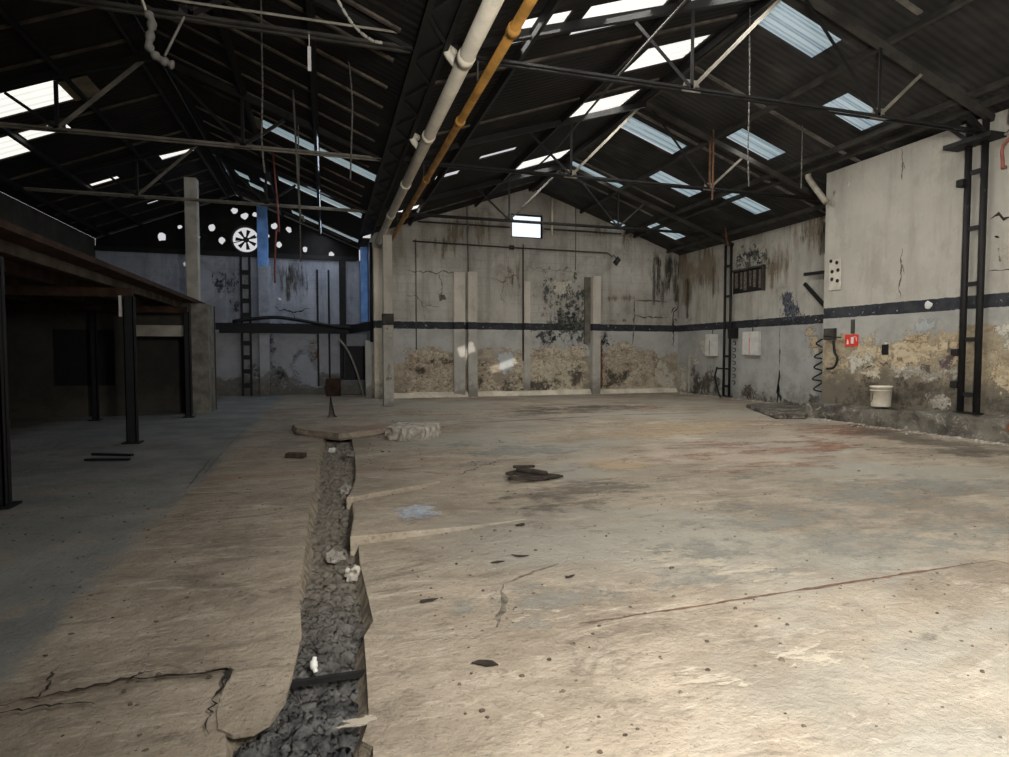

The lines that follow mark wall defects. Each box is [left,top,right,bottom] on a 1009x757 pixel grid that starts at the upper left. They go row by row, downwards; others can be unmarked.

crack [991,212,1009,238]
mould [531,266,590,351]
damp [653,248,719,318]
spalling [403,347,453,393]
spalling [465,344,589,391]
spalling [602,341,658,389]
peeling [833,317,969,383]
peeling [984,322,1009,394]
crack [0,667,232,734]